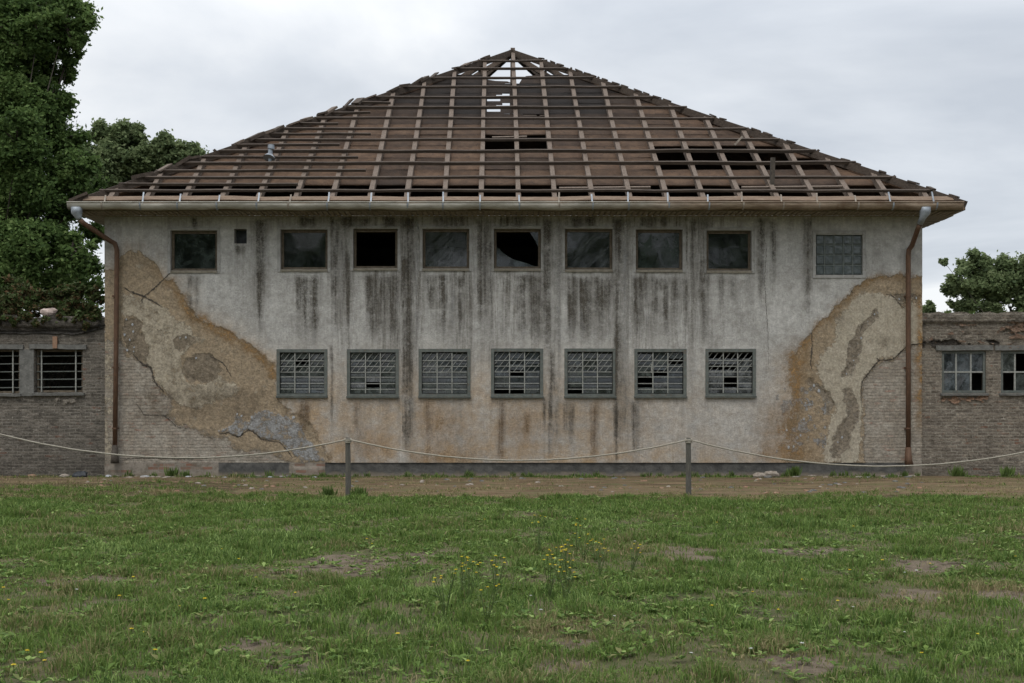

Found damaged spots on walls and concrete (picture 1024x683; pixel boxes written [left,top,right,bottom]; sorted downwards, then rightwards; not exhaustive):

crack [125,273,170,306]
crack [133,354,186,429]
flaking render [0,250,332,463]
water stain [174,291,276,379]
water stain [366,242,413,388]
water stain [427,275,445,317]
water stain [568,221,626,329]
water stain [614,322,634,455]
water stain [633,278,687,324]
flaking render [776,273,1024,463]
crack [861,342,947,401]